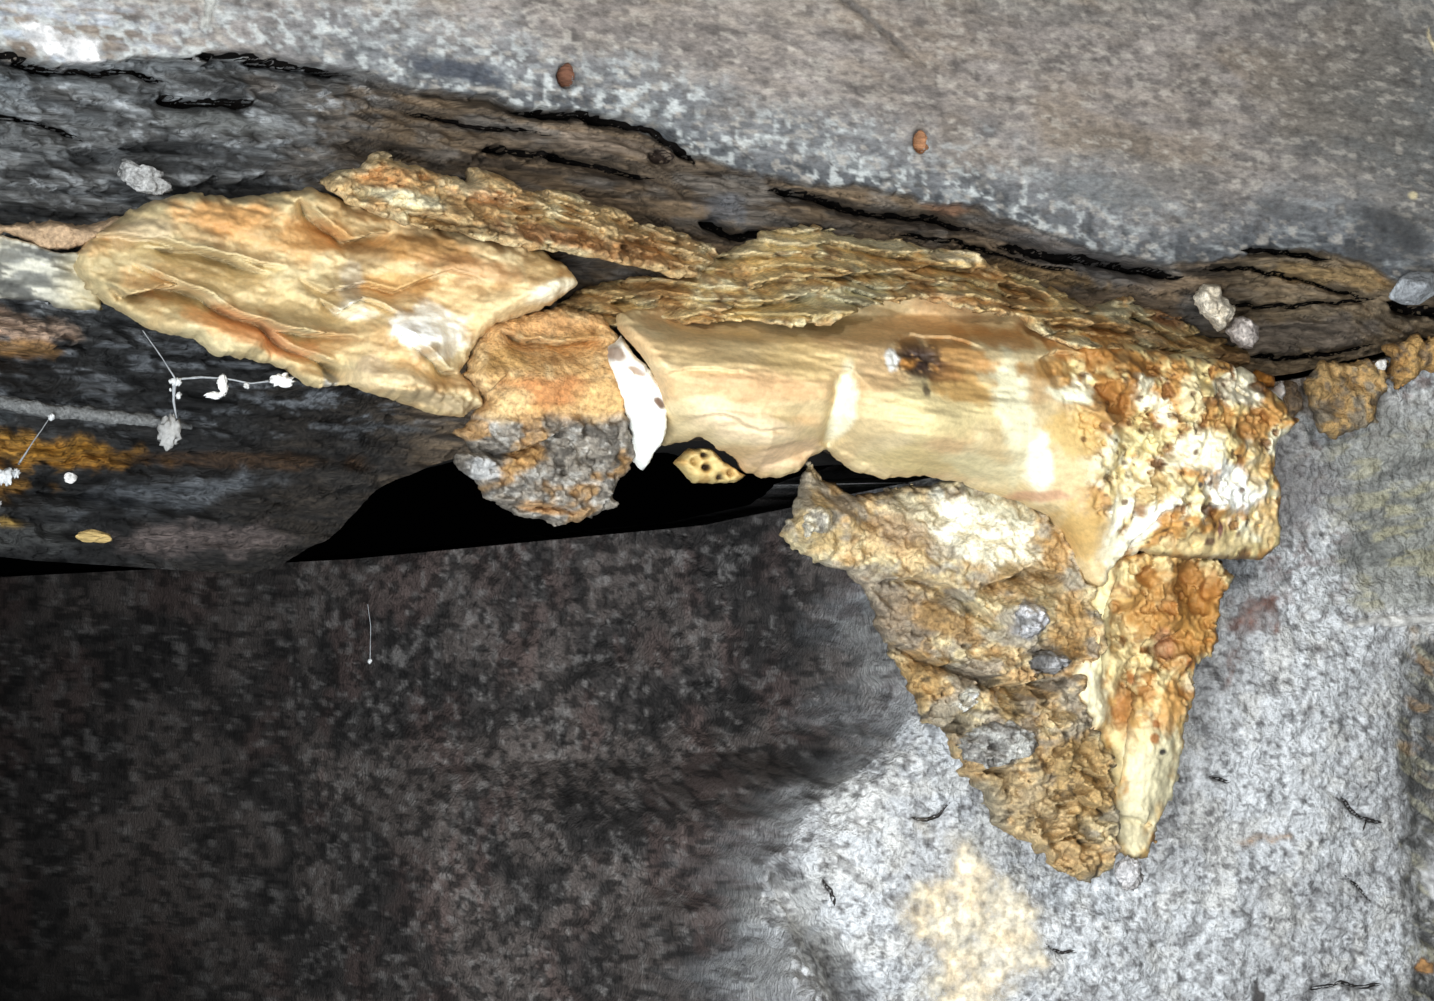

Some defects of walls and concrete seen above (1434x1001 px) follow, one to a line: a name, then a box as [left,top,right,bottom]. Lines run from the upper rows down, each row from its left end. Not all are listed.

spalling [1389,271,1434,305]
flaking render [1375,359,1387,370]
peeling [1271,381,1286,400]
rust [1236,598,1278,632]
crack [1310,980,1379,990]